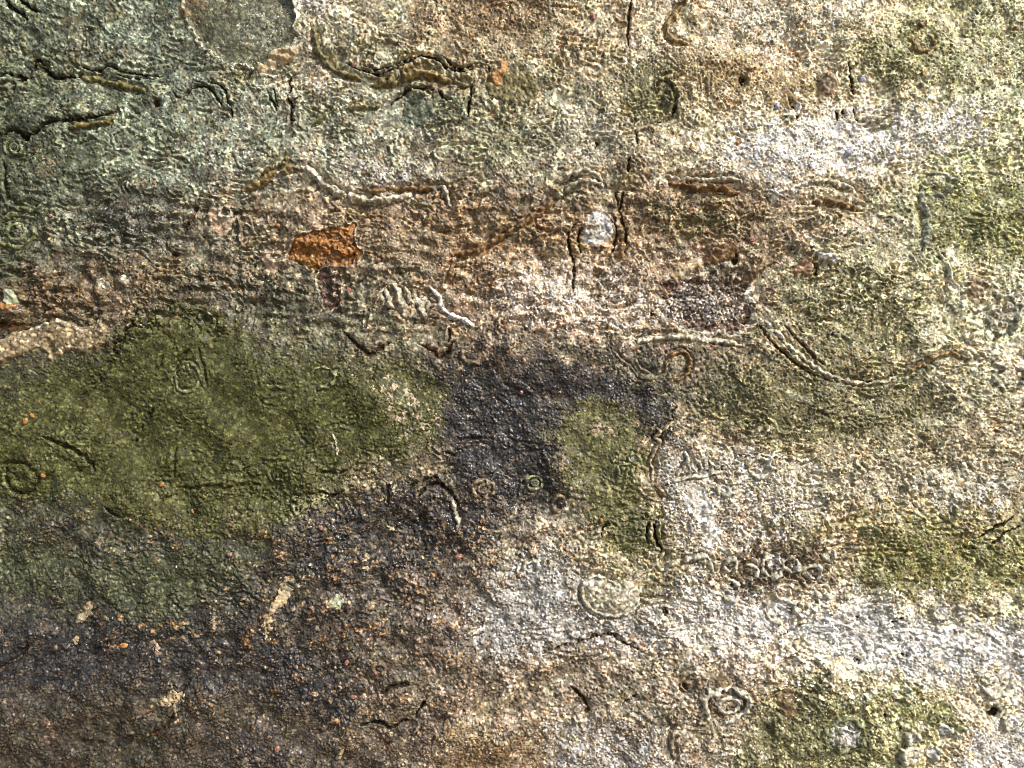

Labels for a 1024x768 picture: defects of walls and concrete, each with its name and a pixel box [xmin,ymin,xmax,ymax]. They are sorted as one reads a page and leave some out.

damp [0,255,1024,768]
crack [566,222,585,293]